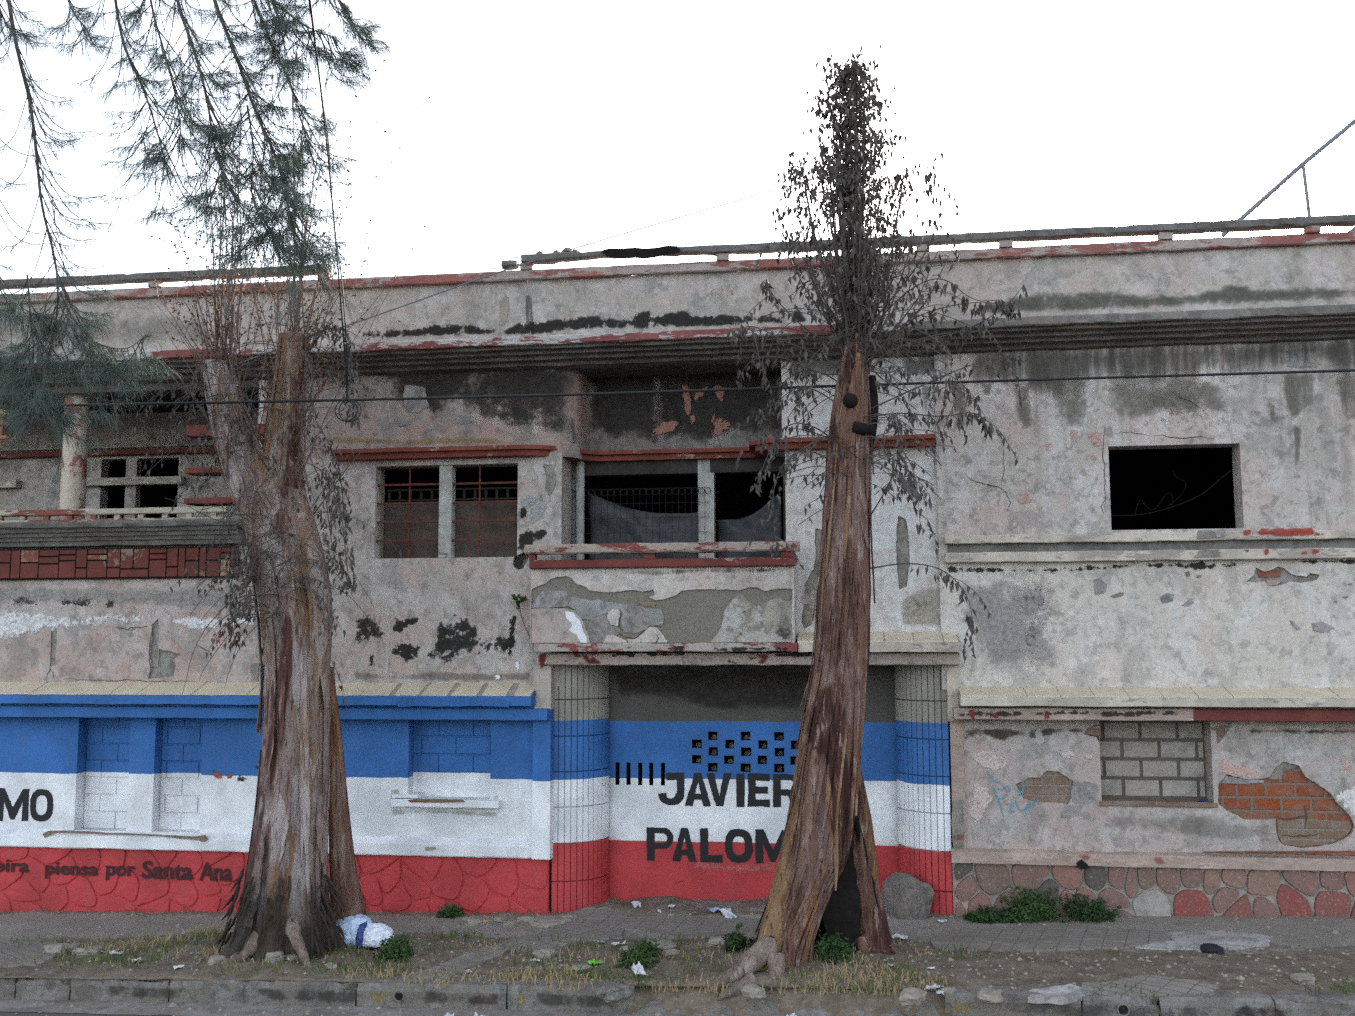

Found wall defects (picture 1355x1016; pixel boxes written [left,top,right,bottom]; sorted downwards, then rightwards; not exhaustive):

leakage [363,296,805,337]
leakage [658,372,782,440]
leakage [976,340,1355,425]
leakage [1271,374,1313,458]
leakage [0,588,253,638]
spalling [531,529,821,643]
spalling [896,516,910,589]
spalling [1185,529,1225,578]
spalling [1243,528,1323,586]
peeling [951,751,1007,849]
spalling [1015,751,1099,818]
spalling [1203,760,1355,856]